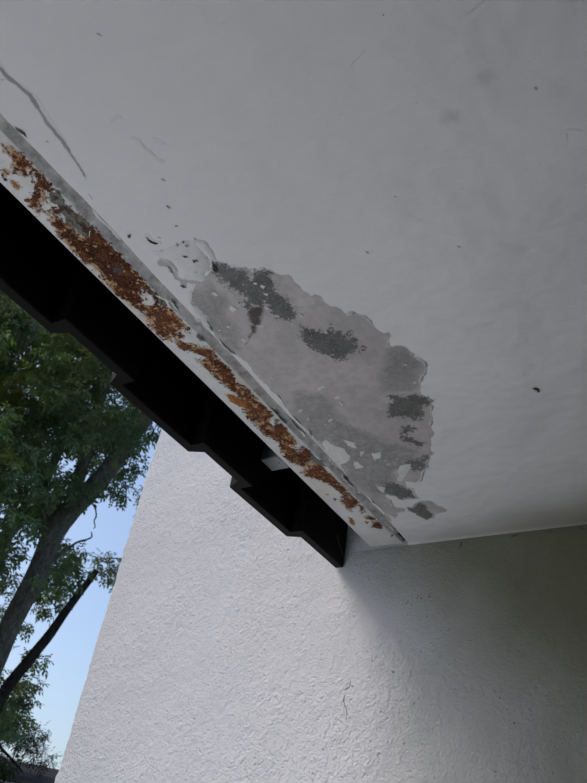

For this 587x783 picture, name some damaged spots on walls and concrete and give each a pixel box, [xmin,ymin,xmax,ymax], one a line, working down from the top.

crack [0,62,88,179]
corrosion [0,145,383,529]
peeling [157,258,446,522]